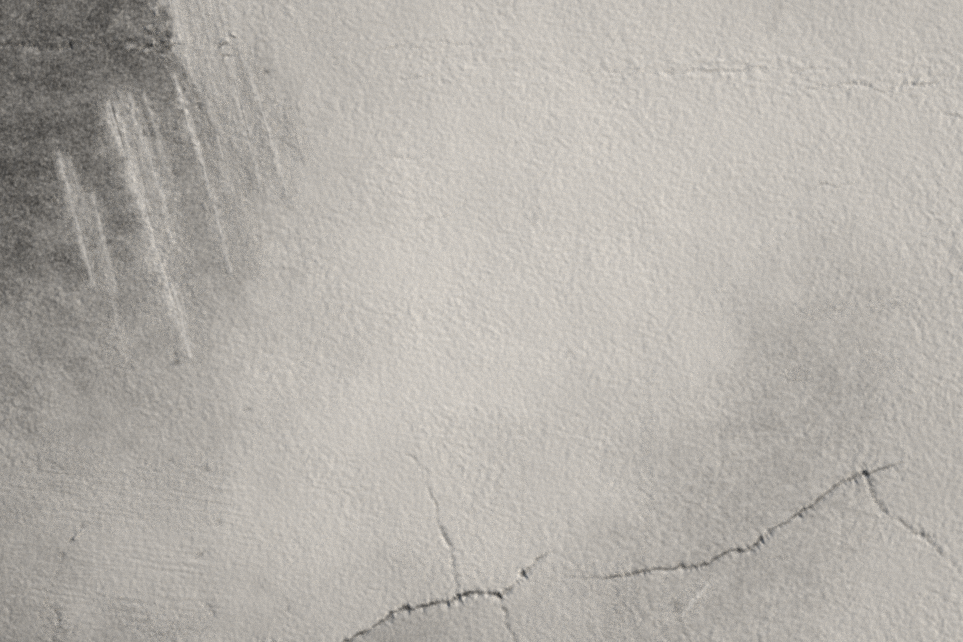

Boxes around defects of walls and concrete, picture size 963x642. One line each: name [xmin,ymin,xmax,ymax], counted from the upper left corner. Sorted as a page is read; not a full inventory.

damp [0,0,291,360]
crack [391,591,501,613]